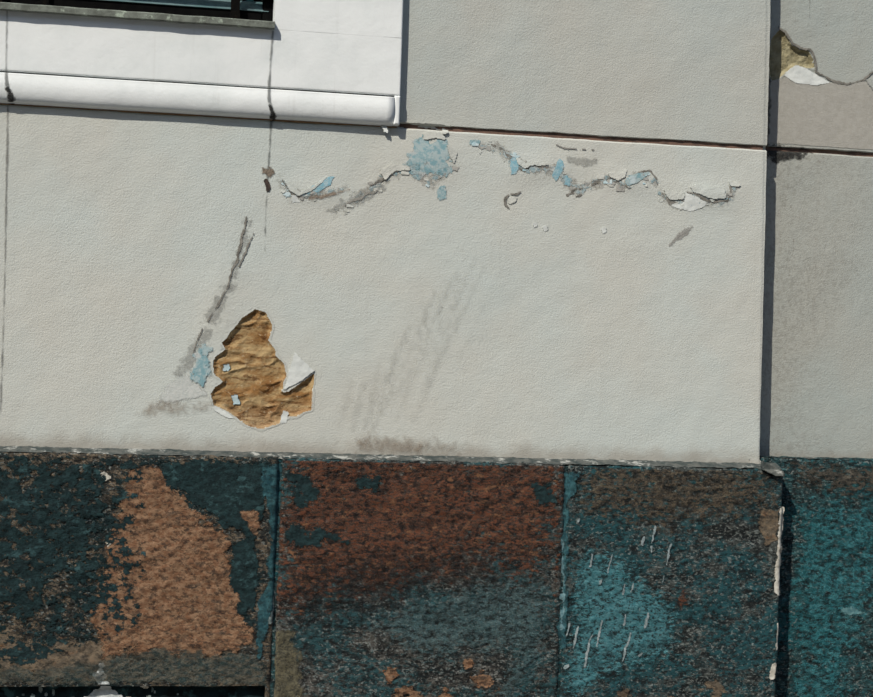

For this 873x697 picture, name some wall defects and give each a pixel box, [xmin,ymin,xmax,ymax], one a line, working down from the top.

peeling [768,26,873,150]
crack [815,70,873,90]
peeling [280,121,459,215]
peeling [469,140,741,211]
crack [159,216,254,404]
spalling [208,306,317,432]
peeling [0,455,271,697]